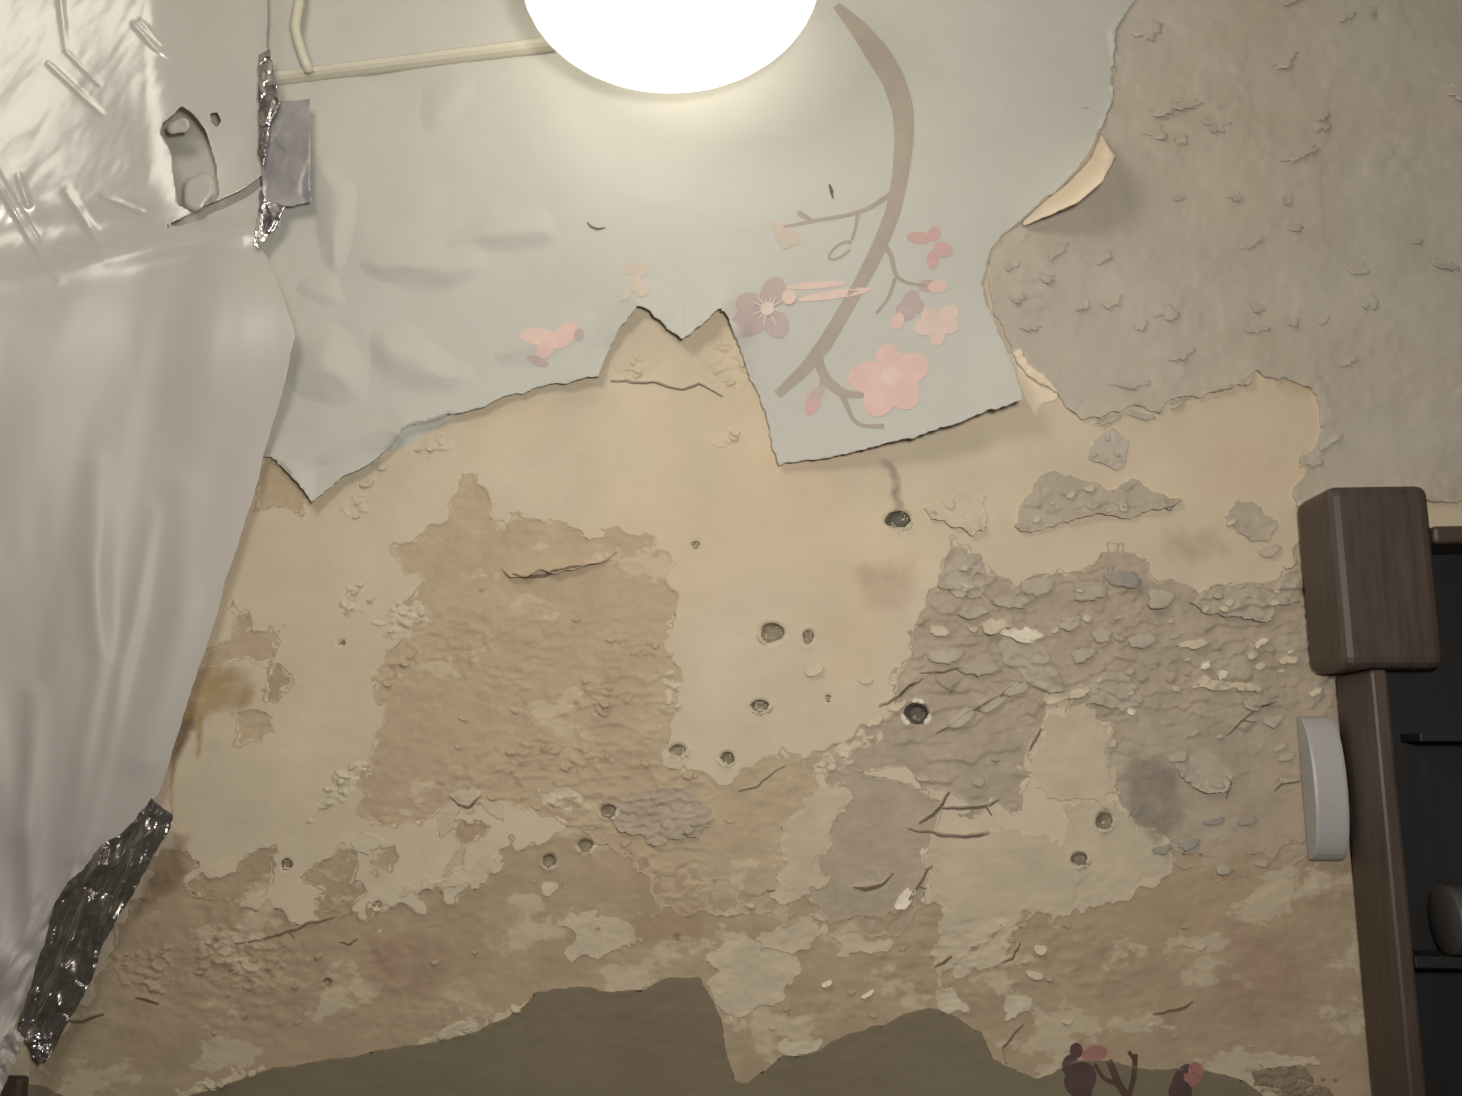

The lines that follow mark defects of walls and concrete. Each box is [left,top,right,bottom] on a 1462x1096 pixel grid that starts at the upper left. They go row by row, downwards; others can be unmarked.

flaking render [252,457,313,517]
peeling [988,0,1462,533]
flaking render [28,473,1373,1096]